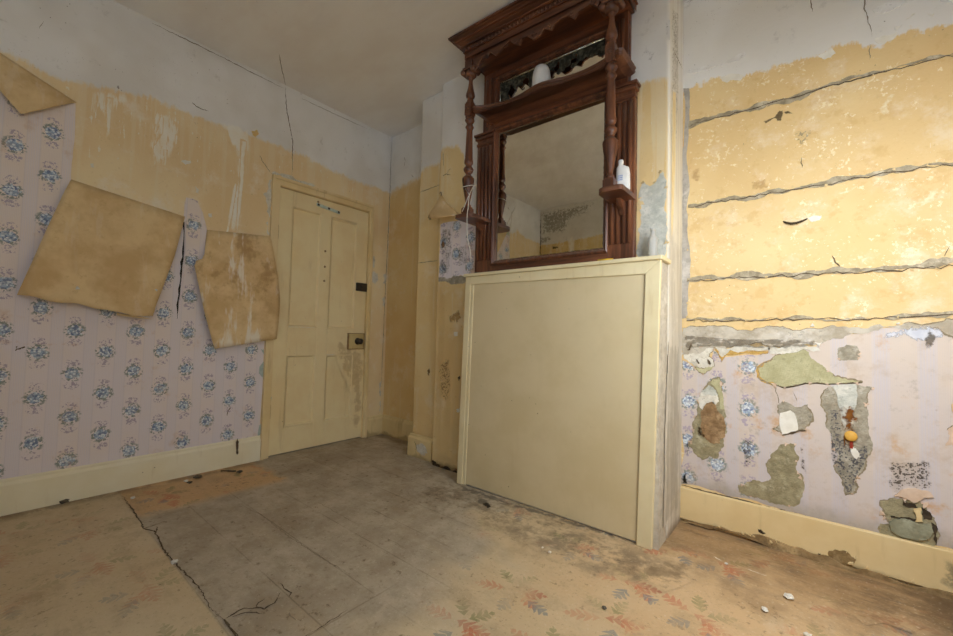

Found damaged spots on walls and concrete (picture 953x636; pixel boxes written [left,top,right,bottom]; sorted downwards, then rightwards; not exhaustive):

crack [157,25,358,174]
spalling [636,53,953,361]
spalling [688,366,727,460]
spalling [772,382,875,496]
spalling [877,488,941,546]